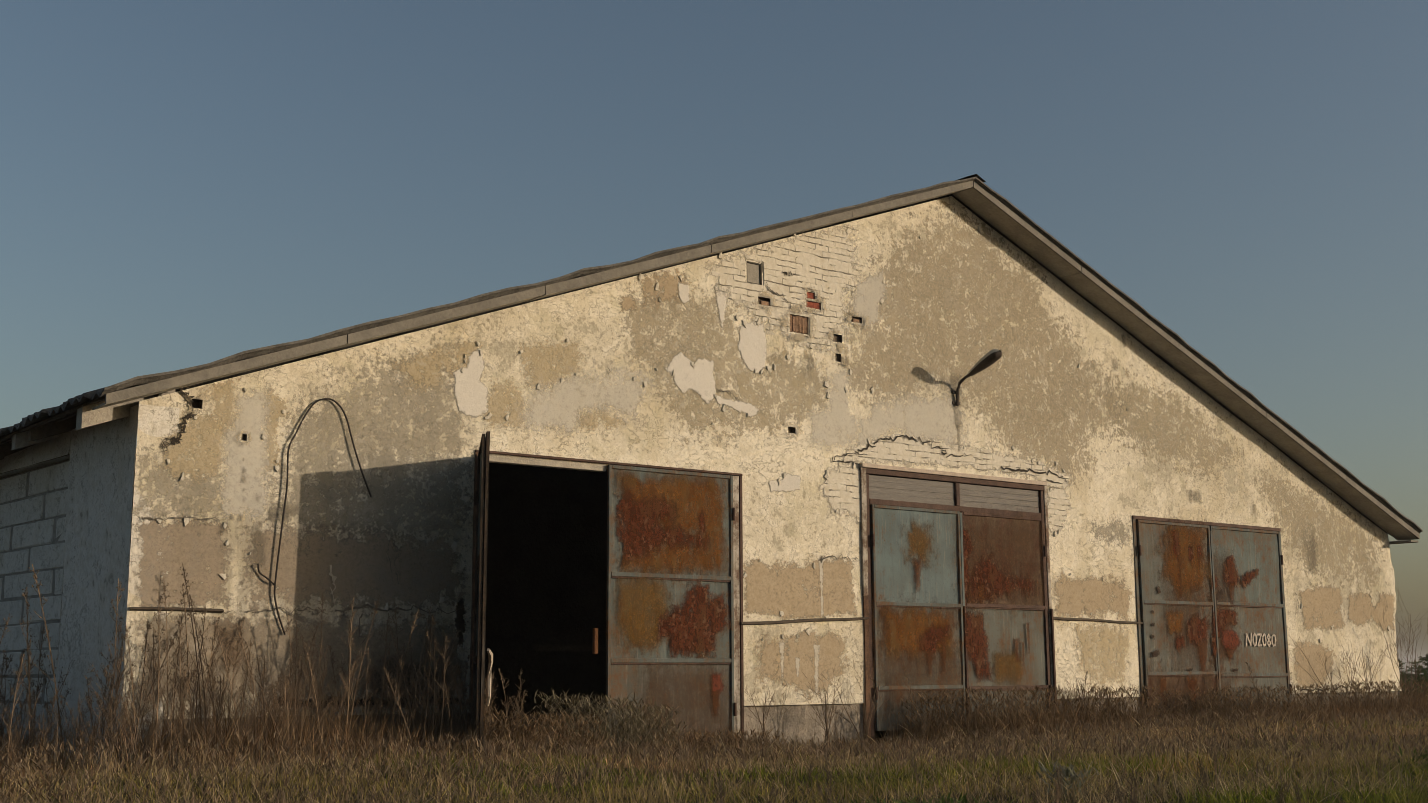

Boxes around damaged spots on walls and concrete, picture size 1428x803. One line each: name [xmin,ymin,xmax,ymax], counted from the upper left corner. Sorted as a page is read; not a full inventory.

crack [161,385,197,455]
flaking render [453,341,483,373]
flaking render [612,201,1128,537]
corrosion [616,469,730,658]
corrosion [906,521,932,588]
corrosion [962,523,993,680]
corrosion [1151,530,1259,672]